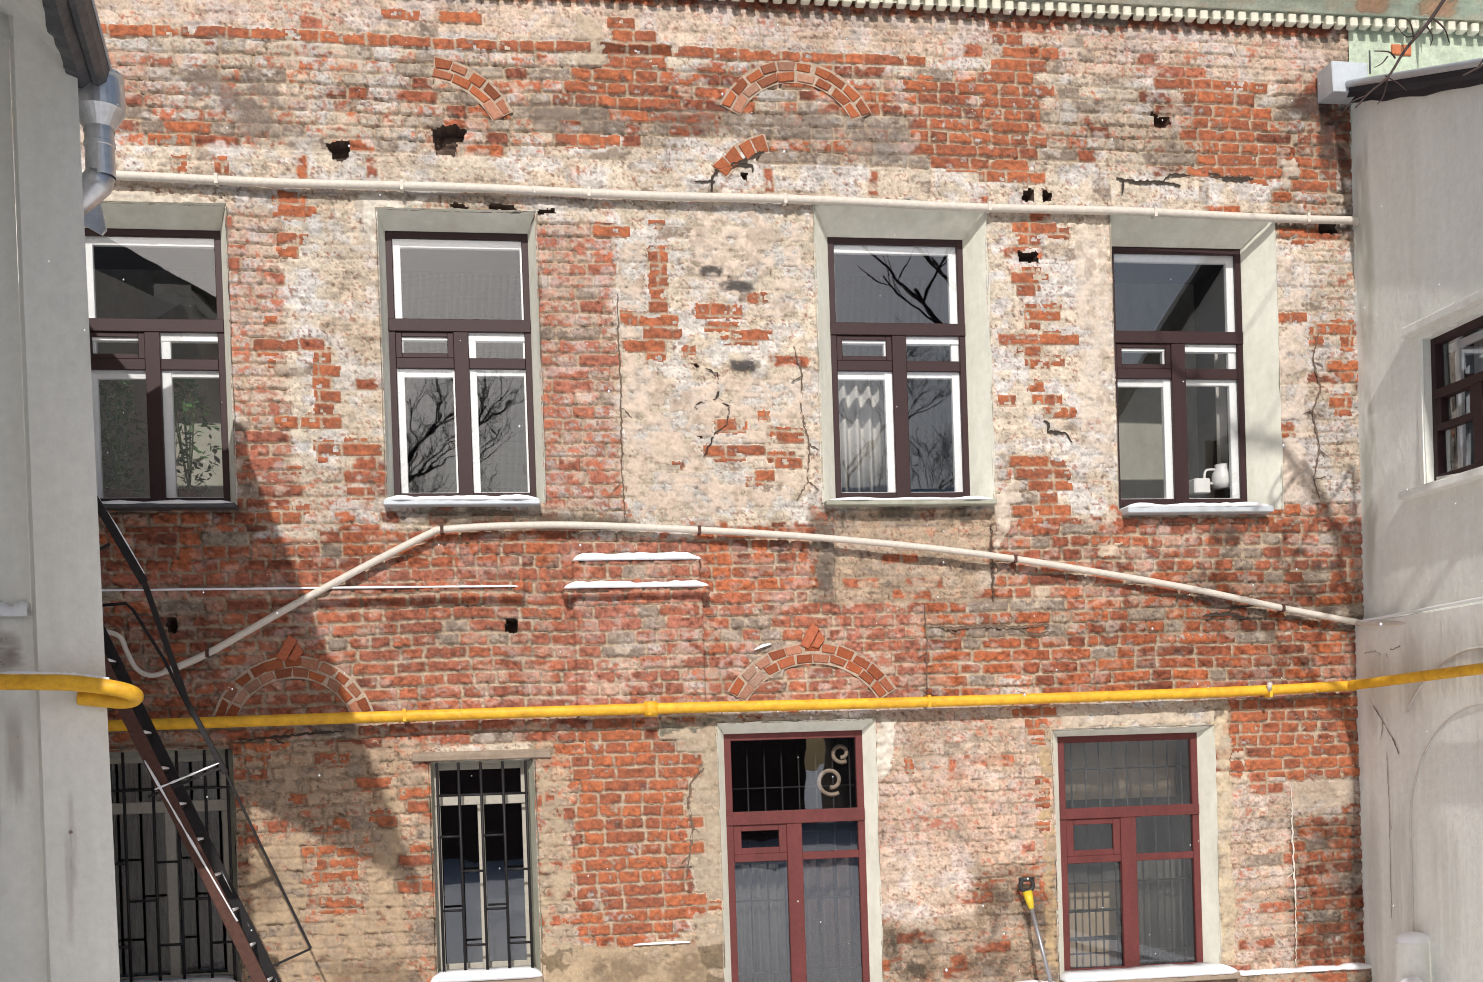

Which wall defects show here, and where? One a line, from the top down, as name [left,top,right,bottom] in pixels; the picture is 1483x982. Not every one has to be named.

spalling [100,8,1059,202]
crack [695,150,764,191]
crack [1116,172,1253,193]
spalling [1150,78,1337,195]
spalling [253,316,382,475]
peeling [593,209,814,522]
crack [690,368,731,456]
crack [792,346,819,500]
peeling [998,221,1116,469]
crack [1303,334,1327,498]
spalling [993,455,1078,553]
spalling [538,711,914,982]